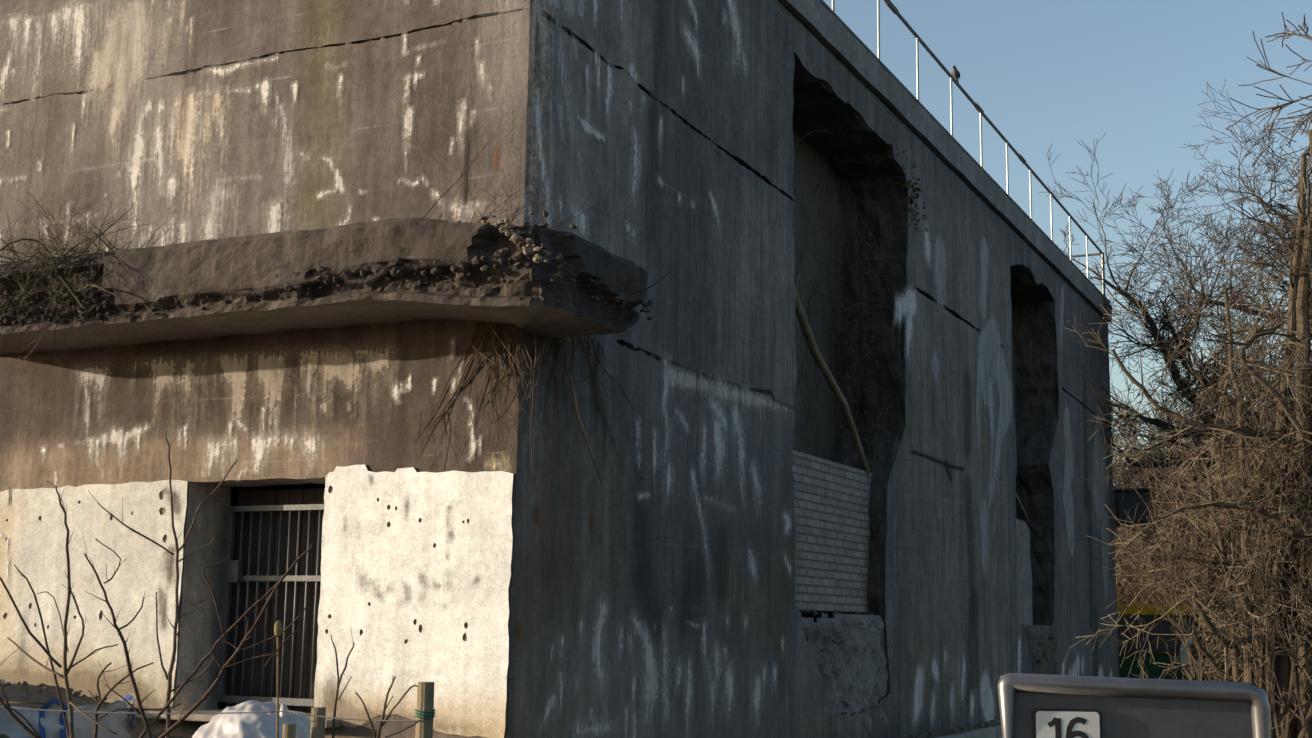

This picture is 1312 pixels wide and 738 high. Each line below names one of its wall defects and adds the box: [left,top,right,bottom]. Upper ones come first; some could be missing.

water stain [0,0,224,246]
efflorescence [204,179,229,240]
efflorescence [209,57,278,76]
efflorescence [248,81,305,233]
water stain [317,157,361,225]
crack [0,8,794,203]
efflorescence [80,367,147,457]
water stain [134,348,411,479]
water stain [540,358,788,738]
spalling [802,613,894,738]